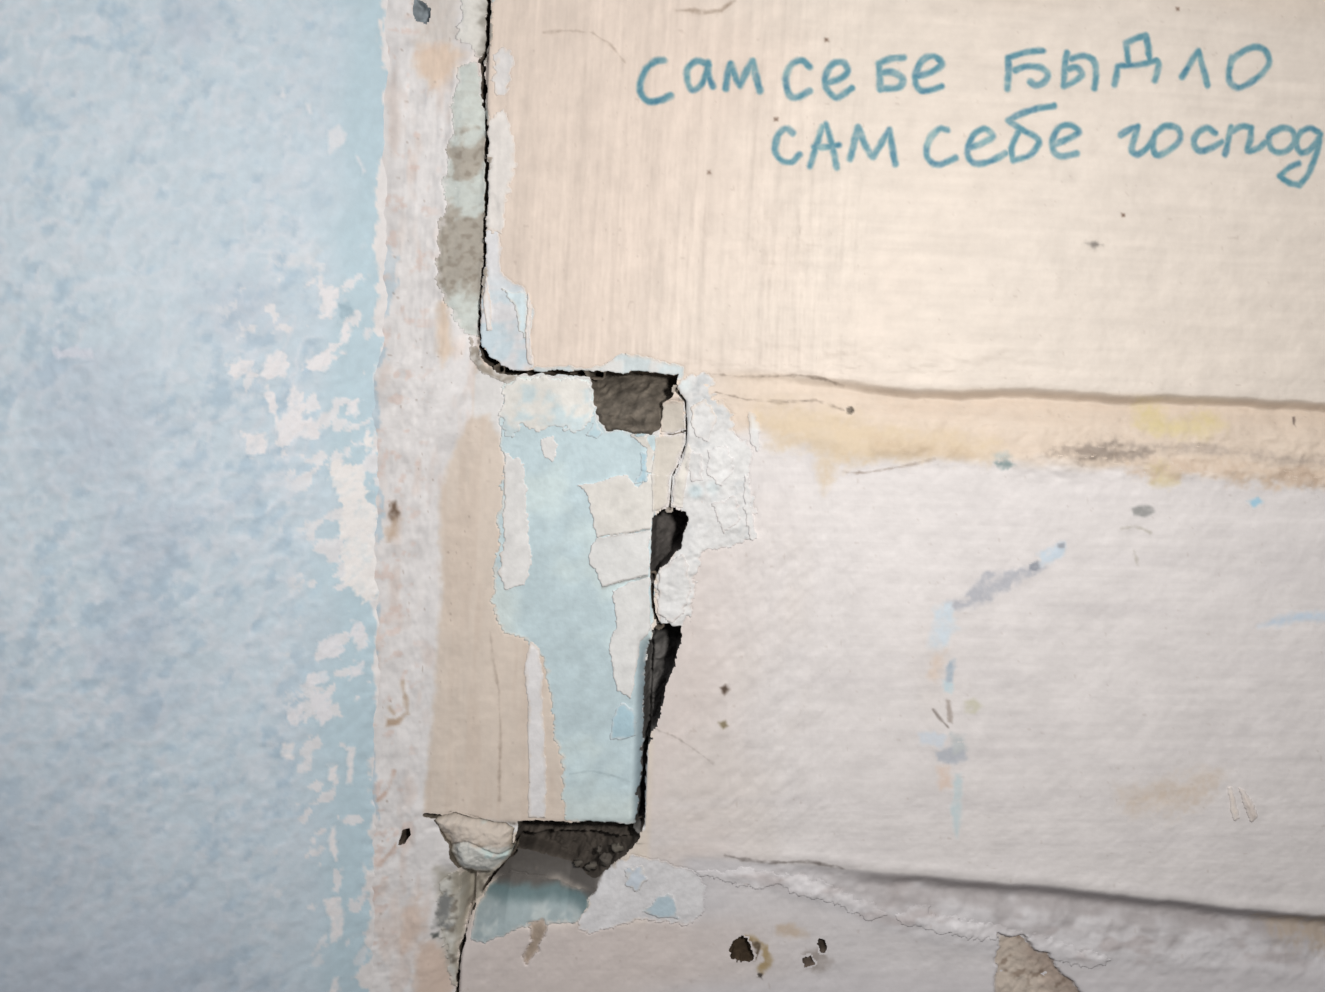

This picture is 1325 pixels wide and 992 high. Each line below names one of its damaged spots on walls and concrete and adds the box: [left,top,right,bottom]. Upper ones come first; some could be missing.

spalling [413,0,431,24]
peeling [222,285,358,458]
peeling [434,0,760,824]
crack [423,0,850,992]
peeling [278,396,379,762]
peeling [324,744,358,787]
peeling [321,894,349,944]
peeling [436,854,707,987]
spalling [802,955,815,967]
spalling [994,932,1080,992]